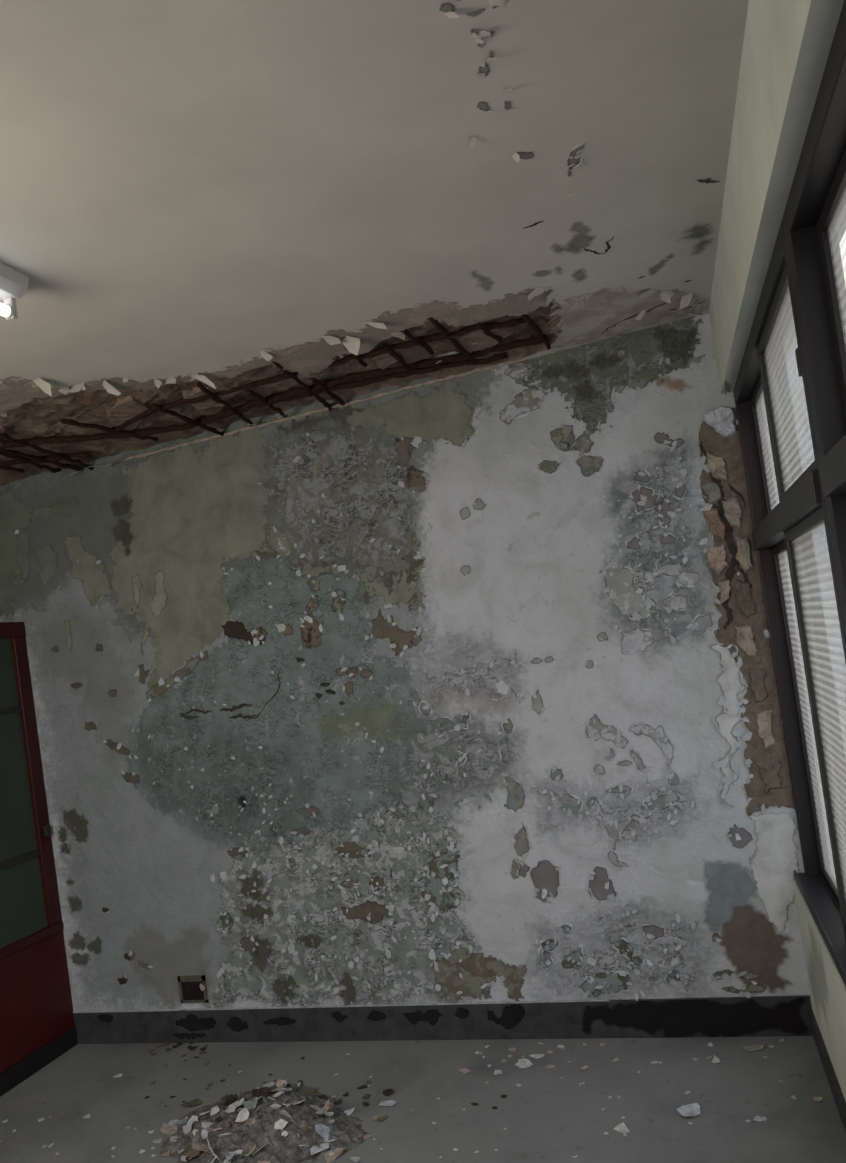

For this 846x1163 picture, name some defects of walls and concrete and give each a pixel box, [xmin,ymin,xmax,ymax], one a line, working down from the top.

peeling [440,3,460,18]
peeling [471,29,499,78]
peeling [478,102,513,113]
peeling [512,152,534,163]
peeling [565,143,585,178]
leakage [508,316,705,436]
leakage [278,406,364,435]
leakage [111,496,134,555]
flaking render [0,283,795,1030]
leakage [582,862,808,1038]
spalling [175,1014,248,1040]